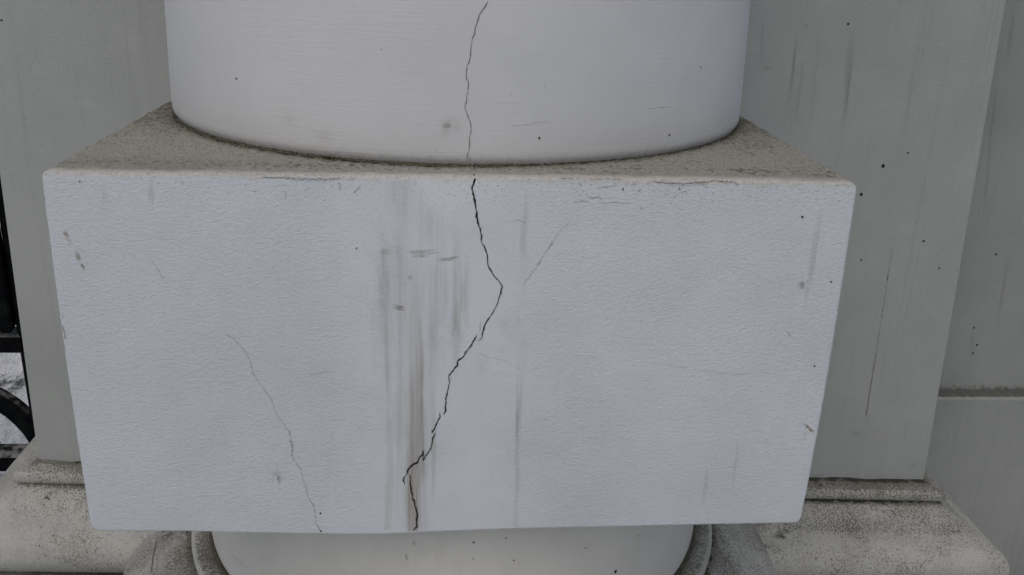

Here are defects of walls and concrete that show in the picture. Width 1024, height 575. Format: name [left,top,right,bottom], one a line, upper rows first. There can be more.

crack [401,1,503,531]